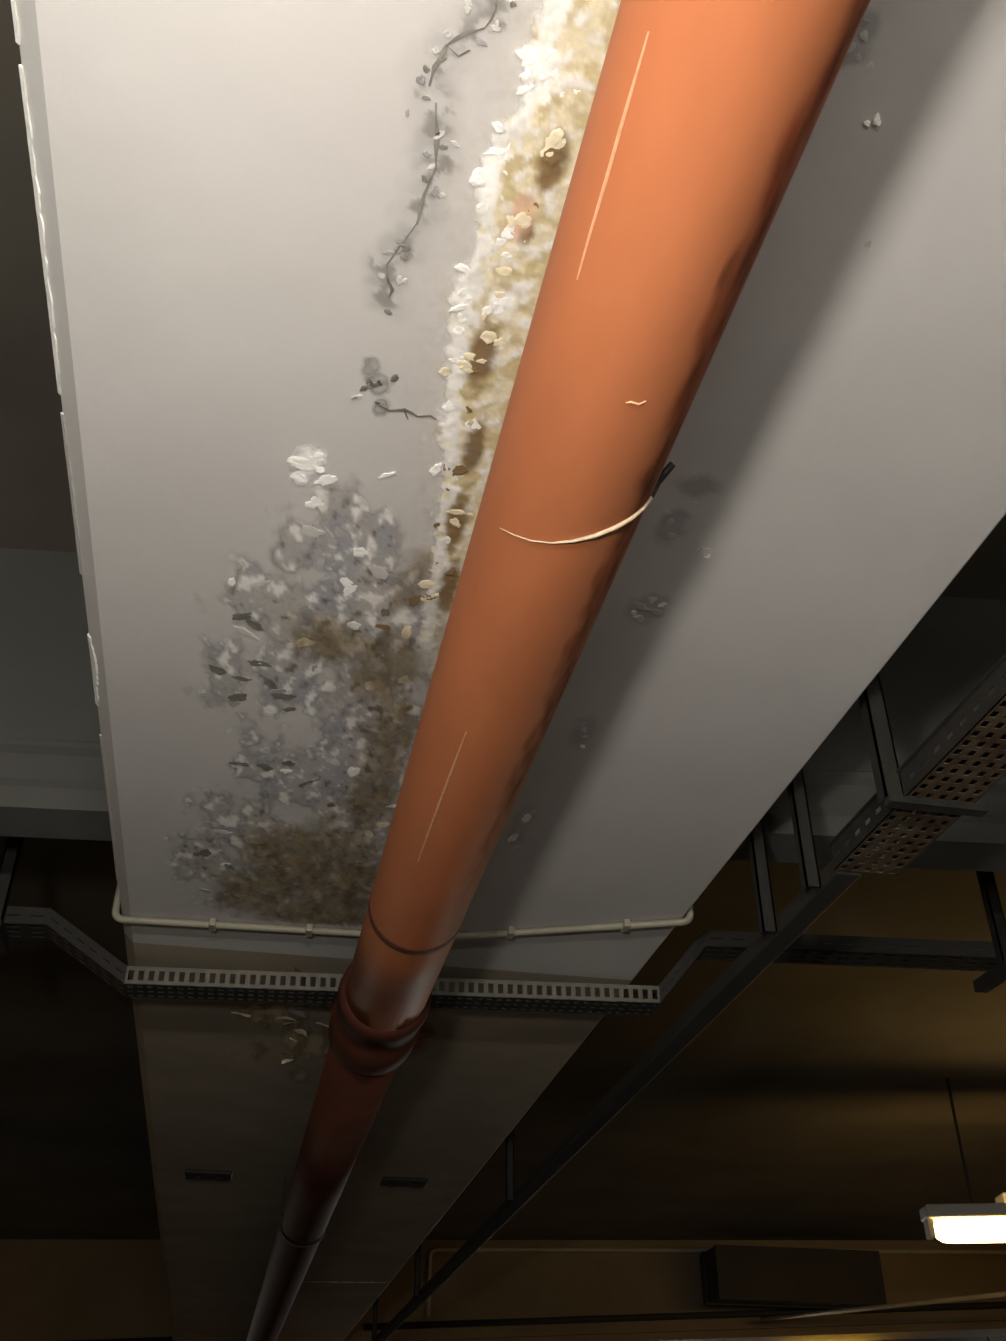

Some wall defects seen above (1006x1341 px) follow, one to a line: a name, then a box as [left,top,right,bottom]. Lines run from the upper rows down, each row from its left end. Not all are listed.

damp [418,0,621,642]
peeling [164,447,440,927]
damp [223,790,391,924]